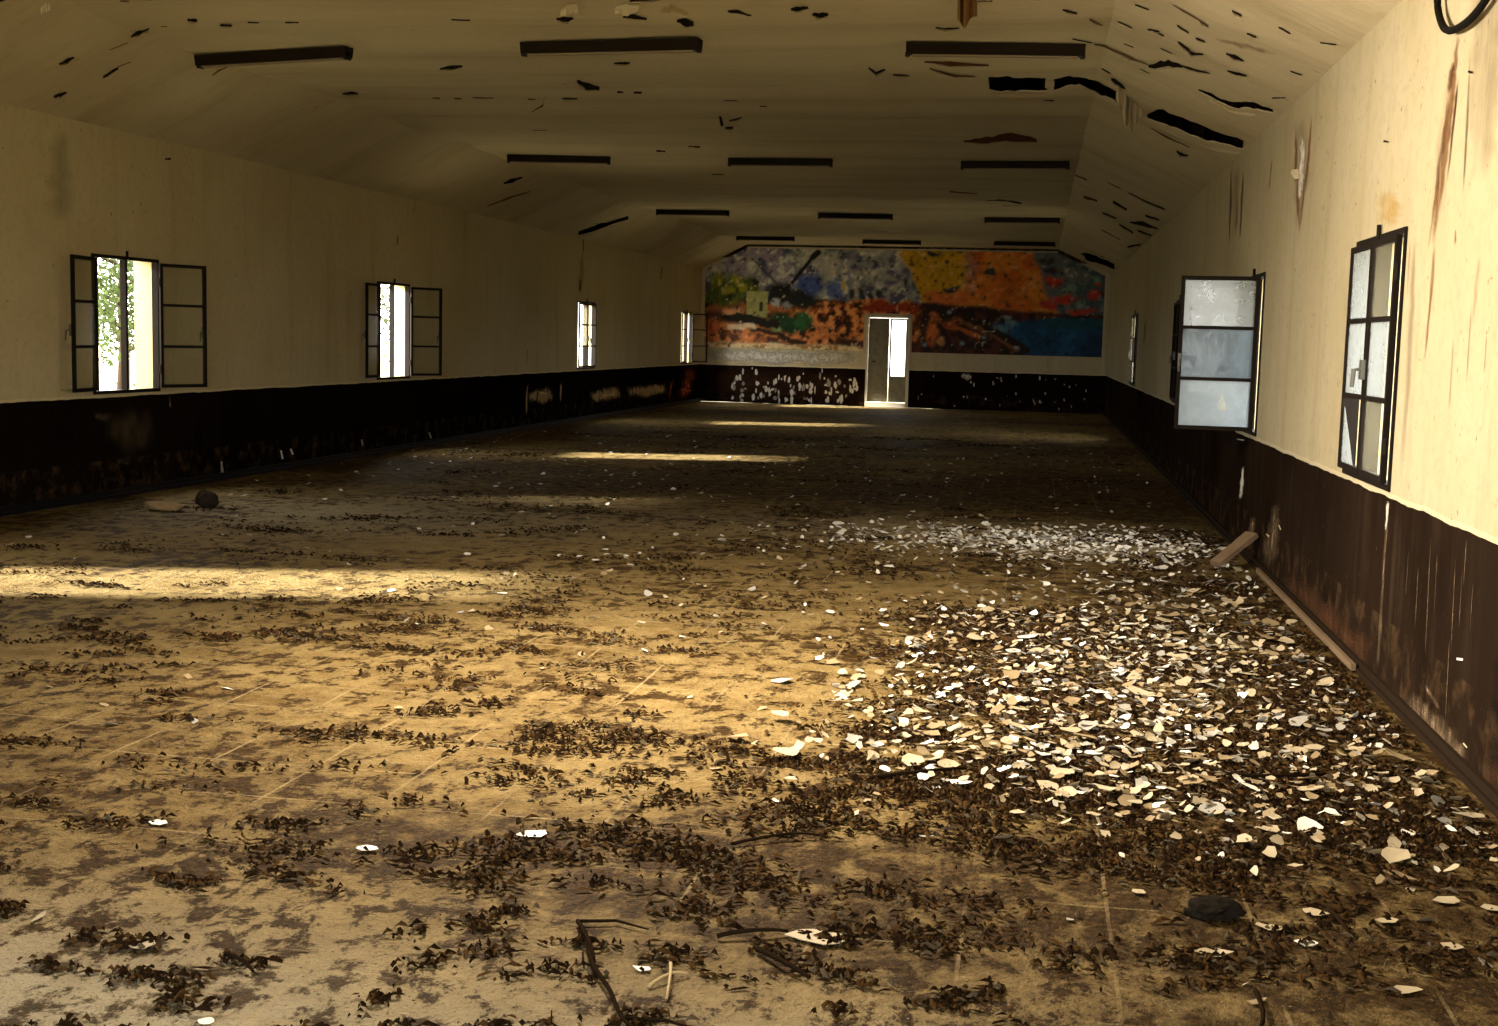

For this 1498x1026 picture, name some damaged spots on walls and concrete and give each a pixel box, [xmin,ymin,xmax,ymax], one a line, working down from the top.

peeling [556,3,578,24]
peeling [615,0,661,21]
peeling [676,10,694,29]
peeling [957,0,993,28]
peeling [1063,5,1208,57]
peeling [1226,53,1247,78]
spalling [1199,89,1273,112]
spalling [1147,109,1243,148]
peeling [713,349,858,404]